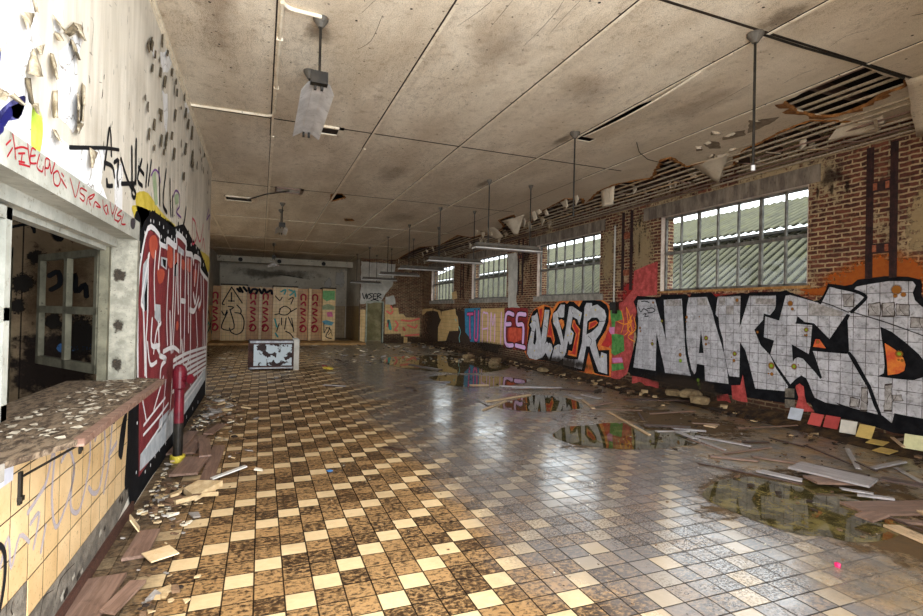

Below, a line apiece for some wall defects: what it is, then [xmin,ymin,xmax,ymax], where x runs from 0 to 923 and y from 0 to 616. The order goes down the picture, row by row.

peeling [0,0,123,210]
peeling [145,34,208,181]
peeling [695,117,779,158]
peeling [423,306,485,351]